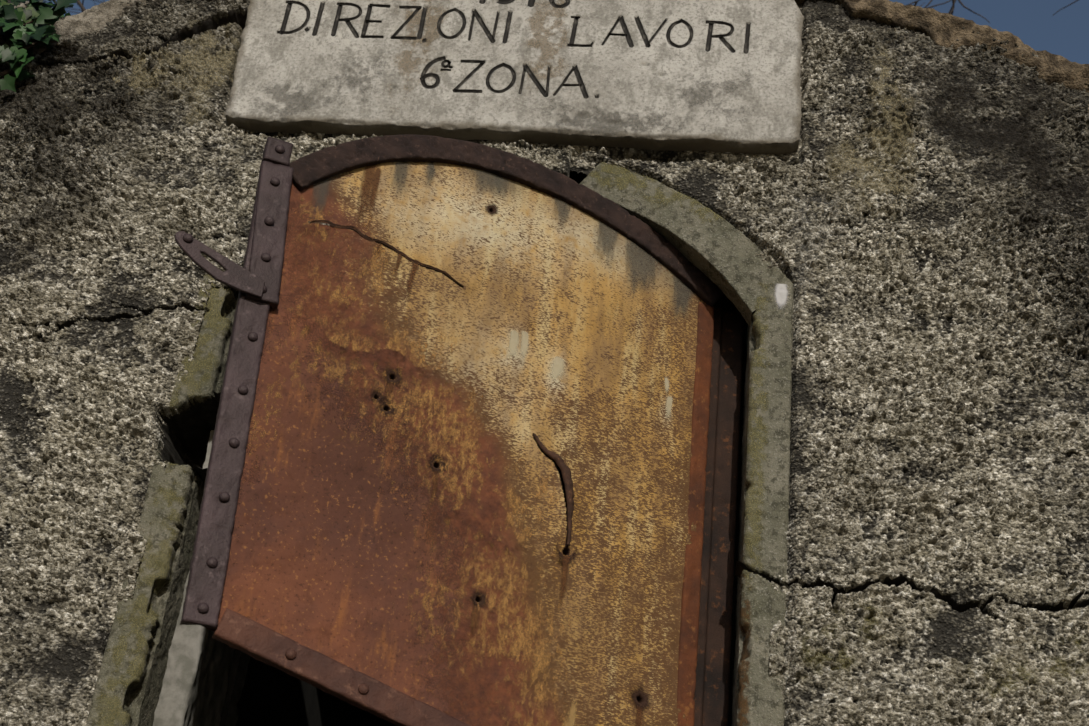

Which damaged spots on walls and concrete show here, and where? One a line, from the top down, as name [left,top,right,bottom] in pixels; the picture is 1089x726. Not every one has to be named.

rust [360,164,381,214]
rust [208,209,496,726]
crack [734,561,1089,621]